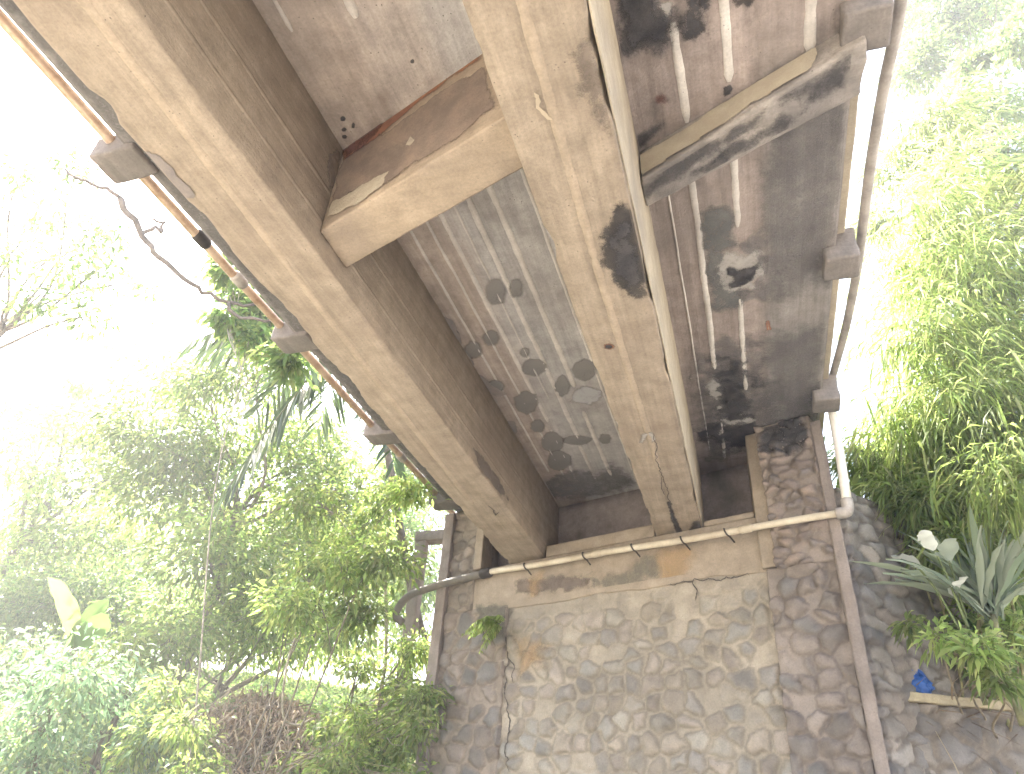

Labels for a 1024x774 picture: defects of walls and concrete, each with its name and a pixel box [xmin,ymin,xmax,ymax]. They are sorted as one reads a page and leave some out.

damp [616,0,710,57]
peeling [327,67,495,216]
damp [599,200,648,299]
hole [718,236,765,301]
damp [645,107,843,312]
damp [514,391,632,499]
damp [555,359,601,404]
crack [640,432,682,533]
damp [690,329,823,460]
damp [517,556,658,595]
crack [668,573,749,601]
crack [502,617,515,770]